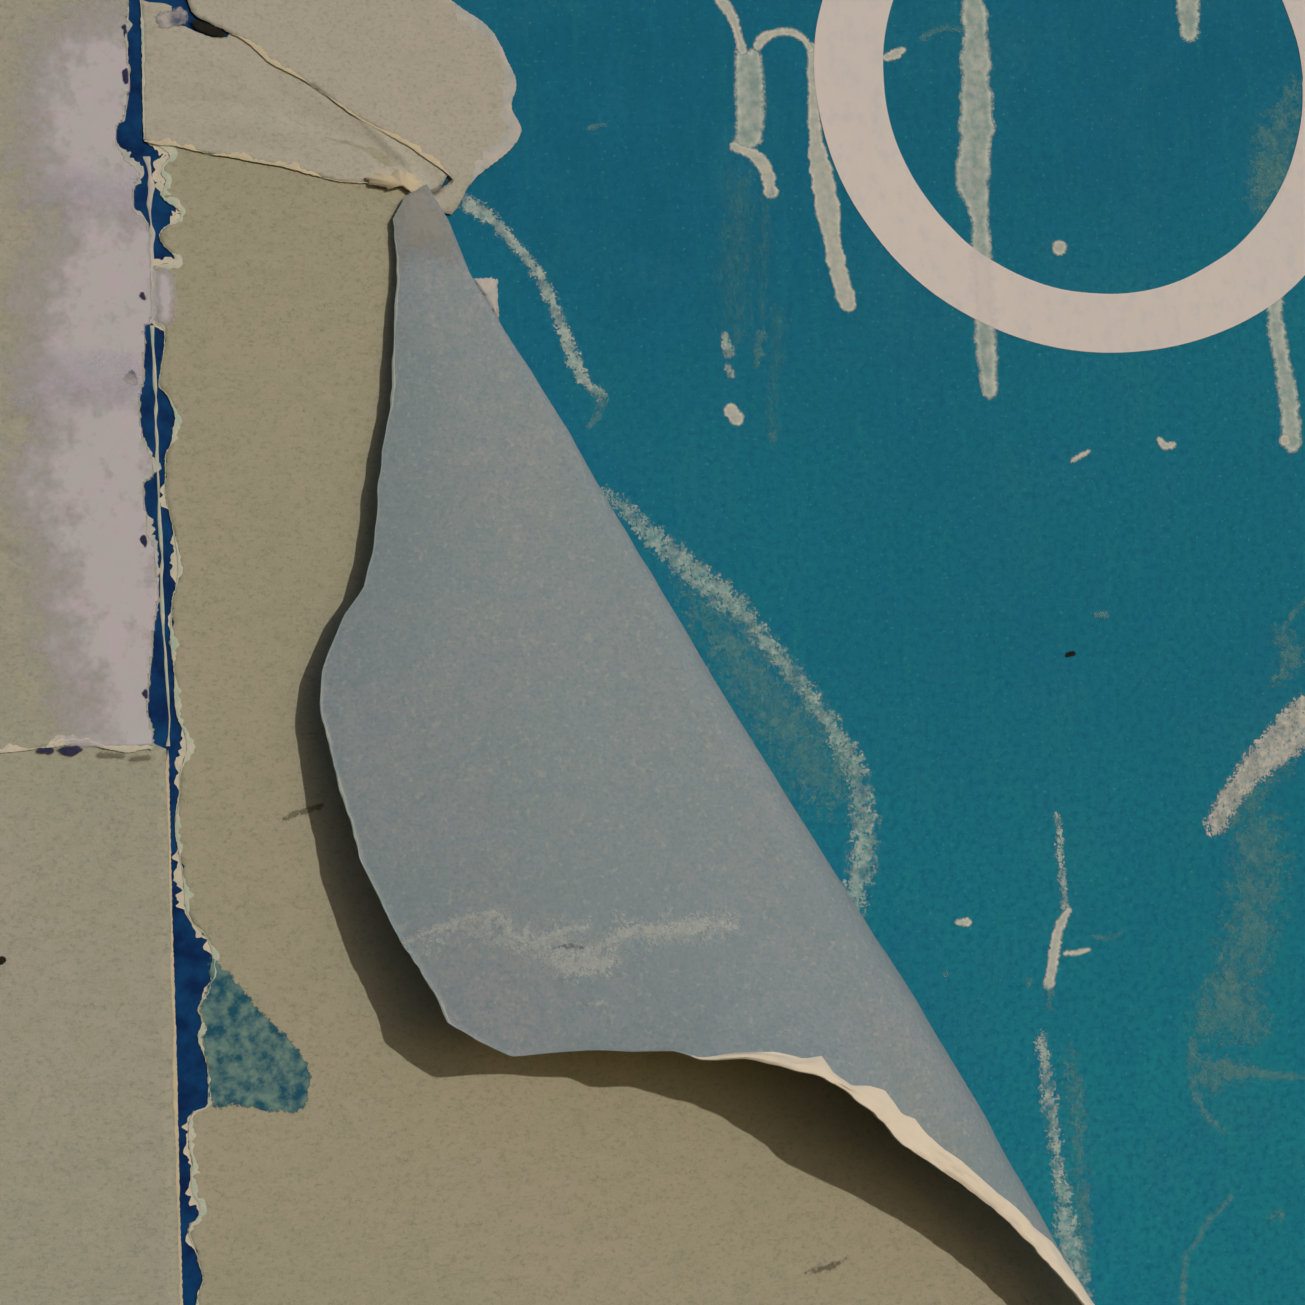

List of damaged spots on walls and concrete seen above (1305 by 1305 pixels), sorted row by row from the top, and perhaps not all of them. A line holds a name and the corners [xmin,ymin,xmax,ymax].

peeling [191,20,226,37]
peeling [459,196,484,222]
peeling [721,332,734,378]
peeling [408,907,730,983]